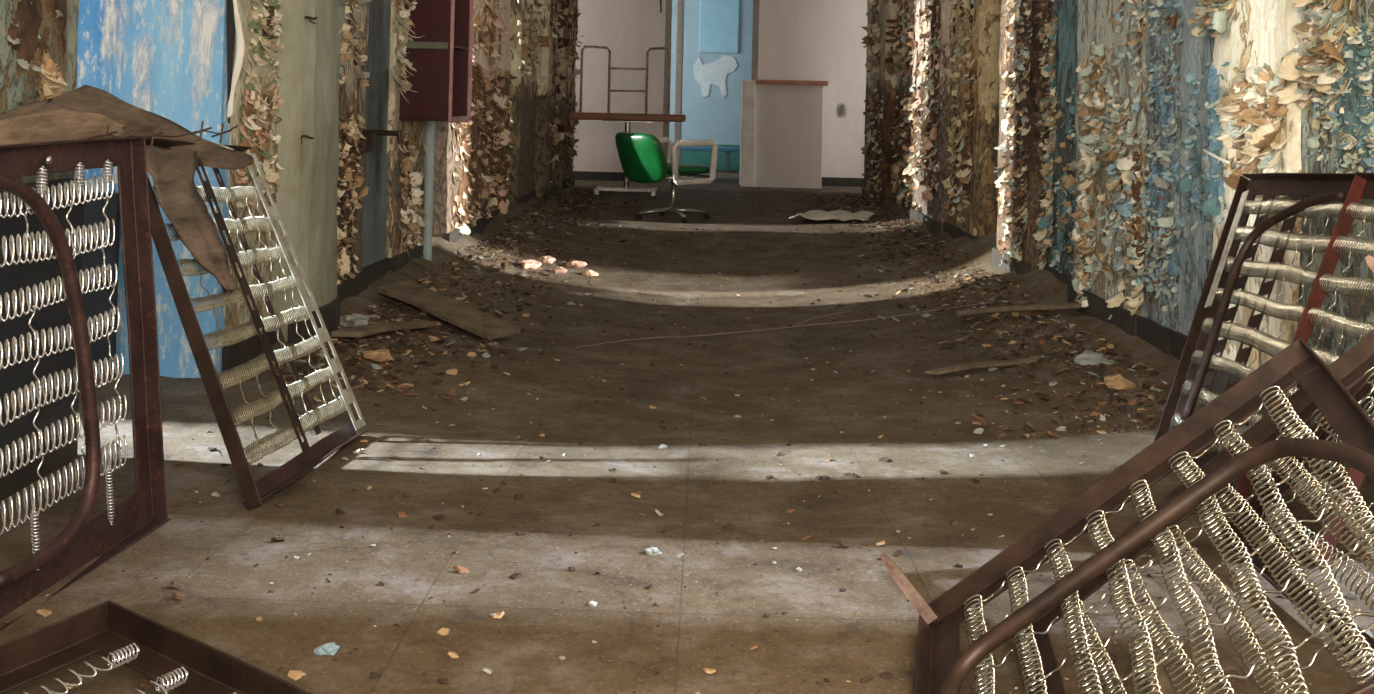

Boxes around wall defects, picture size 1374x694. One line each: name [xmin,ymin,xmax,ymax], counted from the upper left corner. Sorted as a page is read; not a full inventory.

peeling [7,0,68,102]
peeling [226,0,285,211]
peeling [337,108,370,286]
peeling [338,0,373,87]
peeling [392,0,422,103]
peeling [399,125,428,258]
spalling [451,0,583,235]
spalling [861,0,978,231]
spalling [994,0,1374,319]